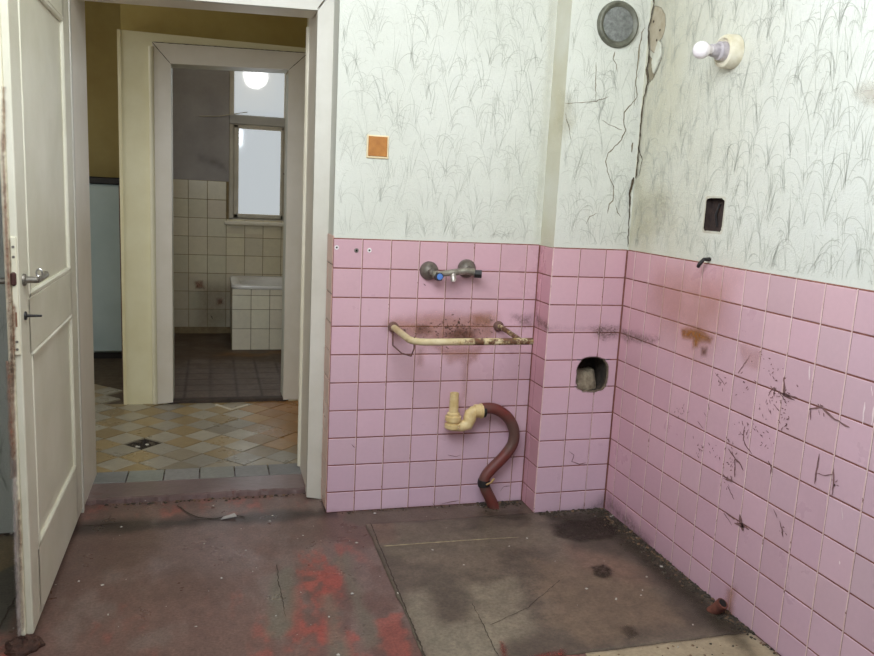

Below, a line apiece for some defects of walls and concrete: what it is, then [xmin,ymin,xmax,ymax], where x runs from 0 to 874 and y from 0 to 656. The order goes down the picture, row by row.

peeling [648,20,662,82]
crack [565,76,609,138]
crack [586,0,654,247]
corrosion [403,314,495,349]
corrosion [682,330,709,354]